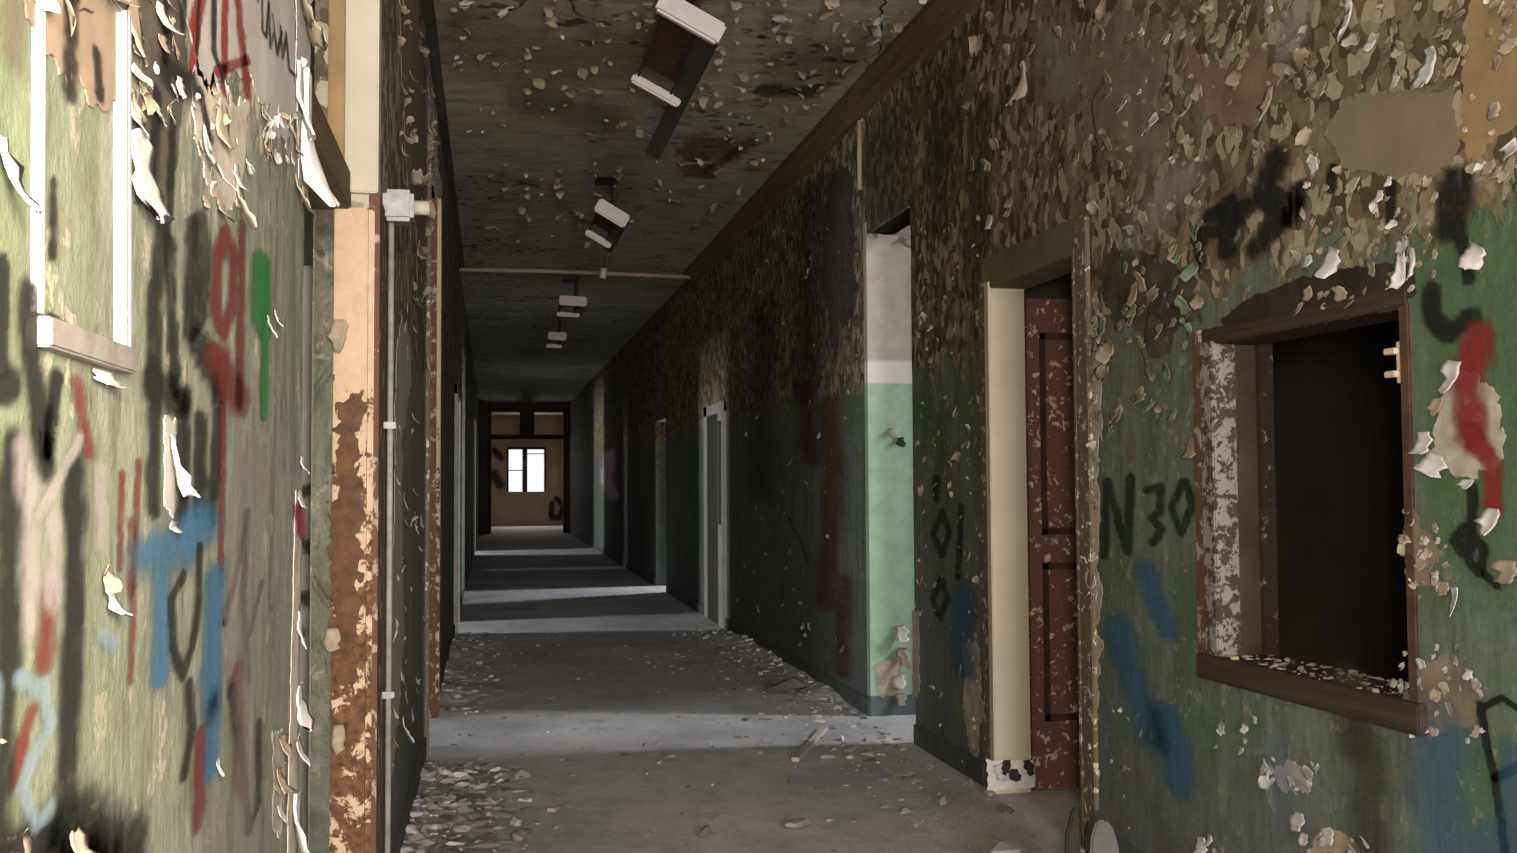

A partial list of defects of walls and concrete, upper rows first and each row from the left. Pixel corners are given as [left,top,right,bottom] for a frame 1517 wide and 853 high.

peeling [23,0,340,230]
peeling [449,0,657,119]
peeling [690,0,927,166]
peeling [0,136,44,215]
peeling [391,0,440,776]
peeling [962,0,1517,744]
peeling [874,604,943,706]
peeling [950,608,1035,791]
peeling [11,829,33,853]
peeling [70,822,97,853]
peeling [1191,834,1224,853]
peeling [1257,756,1369,853]